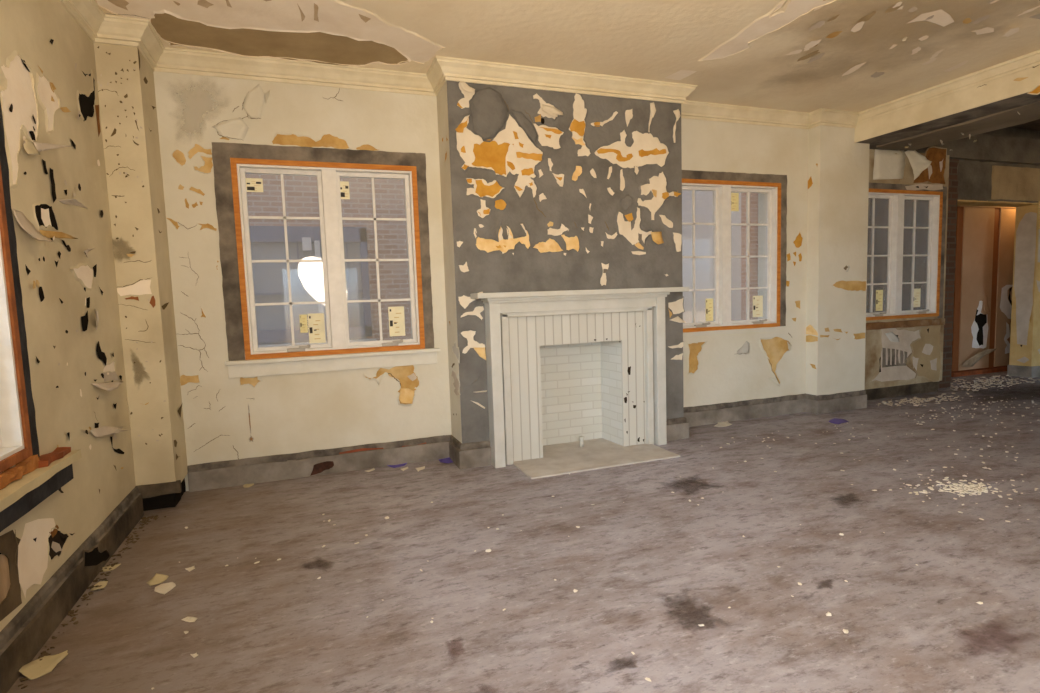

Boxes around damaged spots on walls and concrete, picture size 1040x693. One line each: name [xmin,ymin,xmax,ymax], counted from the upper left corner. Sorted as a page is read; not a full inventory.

flaking render [148,10,411,67]
peeling [665,0,1040,80]
peeling [0,50,180,469]
crack [118,260,154,343]
flaking render [157,132,434,361]
peeling [442,82,867,387]
crack [179,257,246,460]
flaking render [363,365,421,406]
flaking render [0,518,74,621]